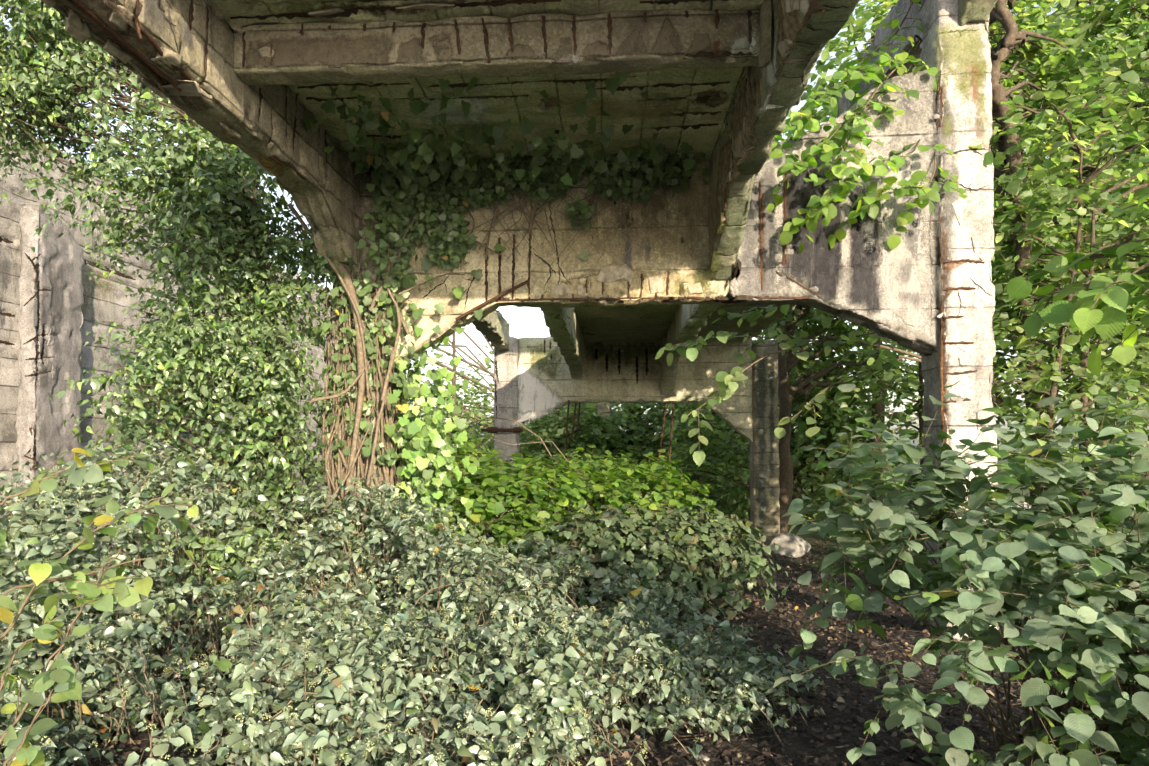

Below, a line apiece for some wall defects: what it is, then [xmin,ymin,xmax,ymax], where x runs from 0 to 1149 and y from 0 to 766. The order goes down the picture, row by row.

spalling [41,0,213,111]
peeling [230,0,753,70]
spalling [774,0,820,77]
corrosion [971,65,982,100]
spalling [253,75,761,229]
water stain [745,107,959,338]
corrosion [940,234,966,448]